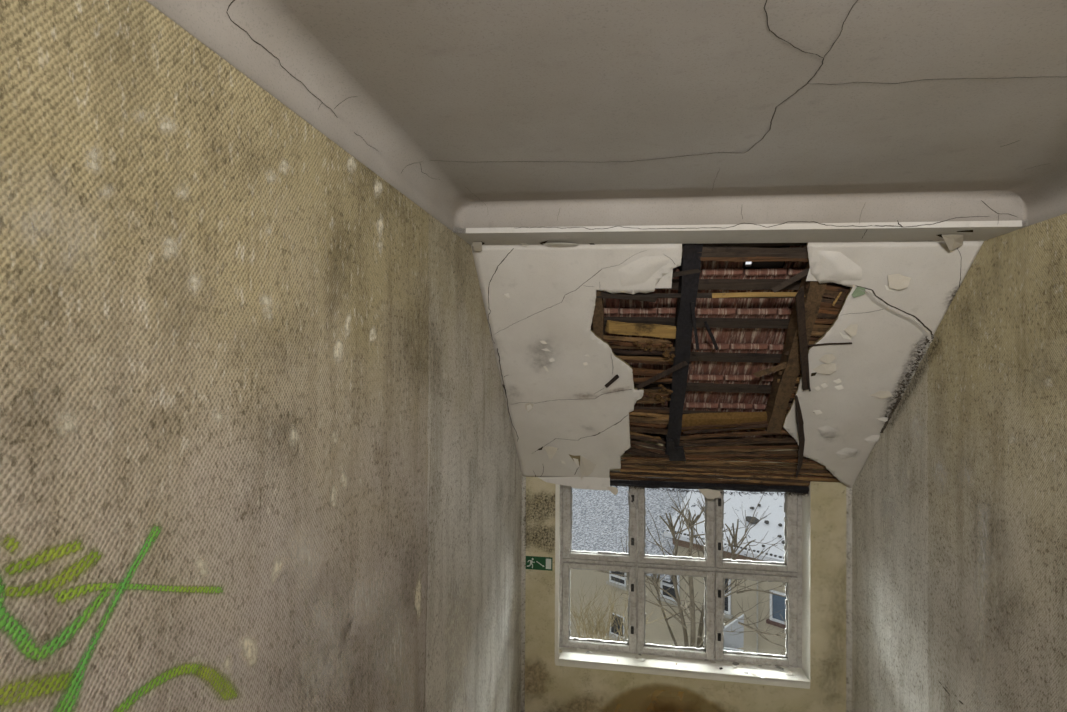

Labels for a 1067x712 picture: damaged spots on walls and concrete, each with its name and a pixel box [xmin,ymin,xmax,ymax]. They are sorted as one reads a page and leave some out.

crack [226,0,379,152]
crack [631,0,933,189]
crack [488,200,1017,477]